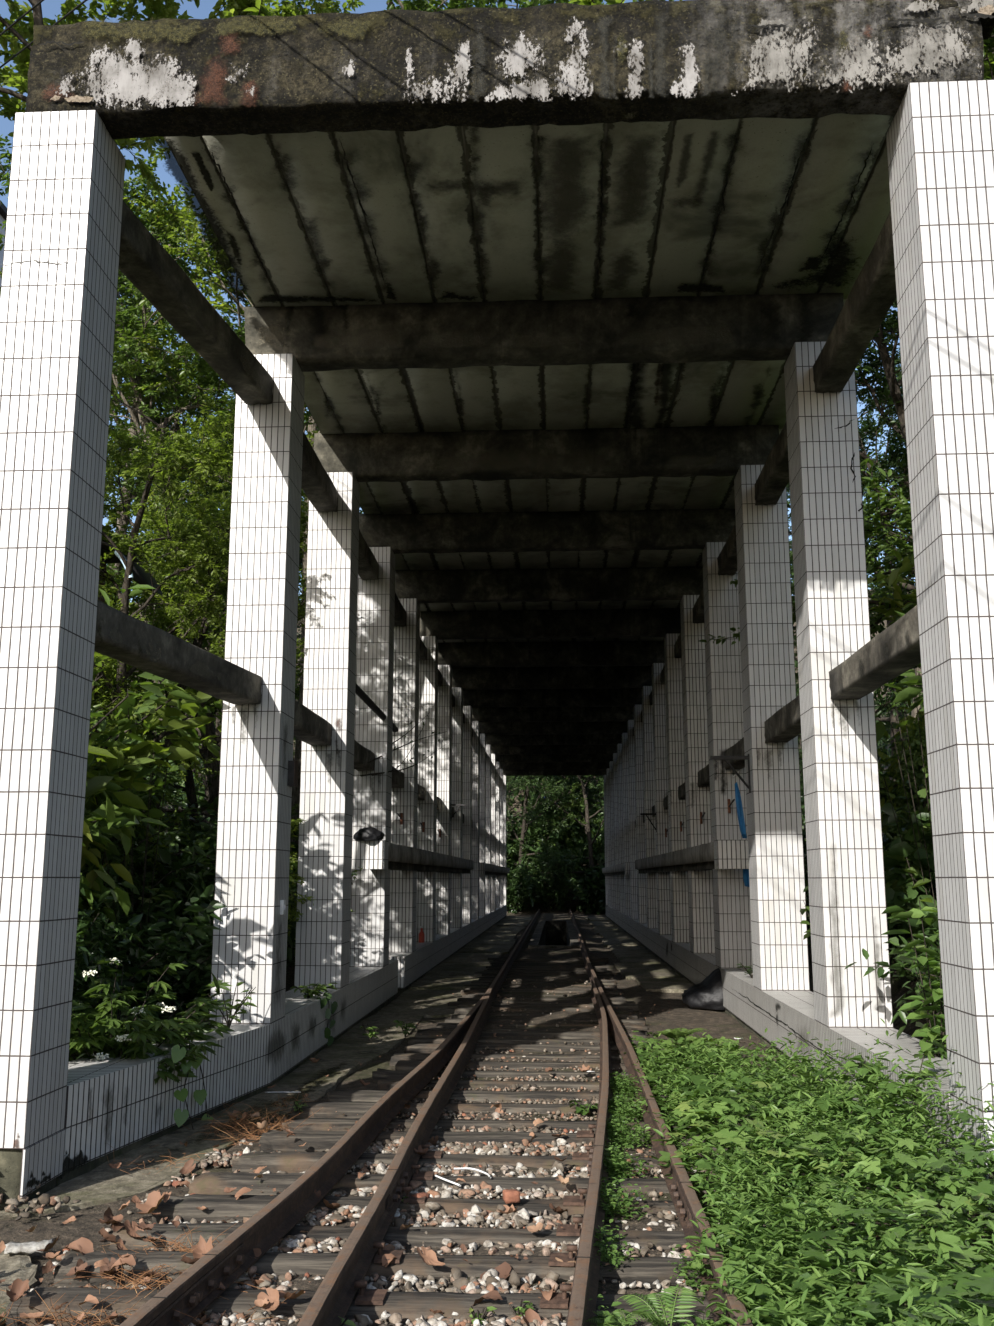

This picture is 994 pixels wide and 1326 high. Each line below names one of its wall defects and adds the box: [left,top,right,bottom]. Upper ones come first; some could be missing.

corrosion [200,63,223,101]
corrosion [243,81,256,101]
damp [151,139,396,348]
damp [429,127,520,263]
damp [533,137,656,290]
damp [25,1150,89,1189]